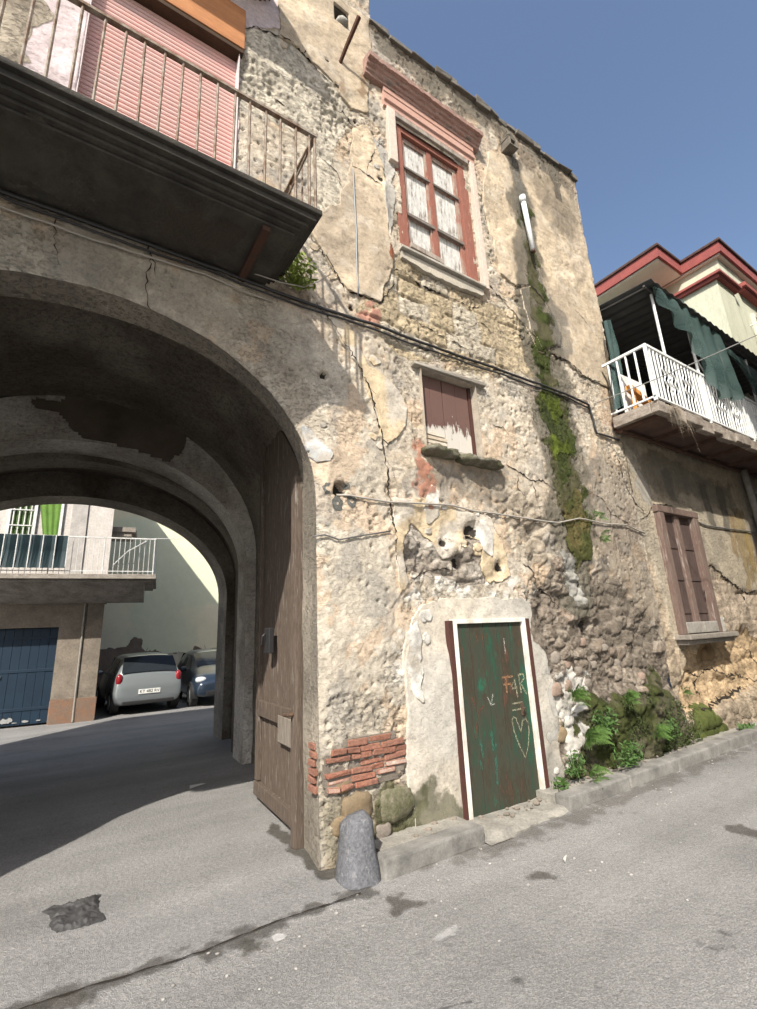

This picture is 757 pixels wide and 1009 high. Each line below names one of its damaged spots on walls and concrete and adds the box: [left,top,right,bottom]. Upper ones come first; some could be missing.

crack [145,246,156,310]
peeling [238,0,609,450]
crack [312,296,398,562]
damp [507,153,596,621]
peeling [392,485,511,593]
crack [704,564,756,603]
crack [687,646,757,711]
flaking render [307,730,415,839]